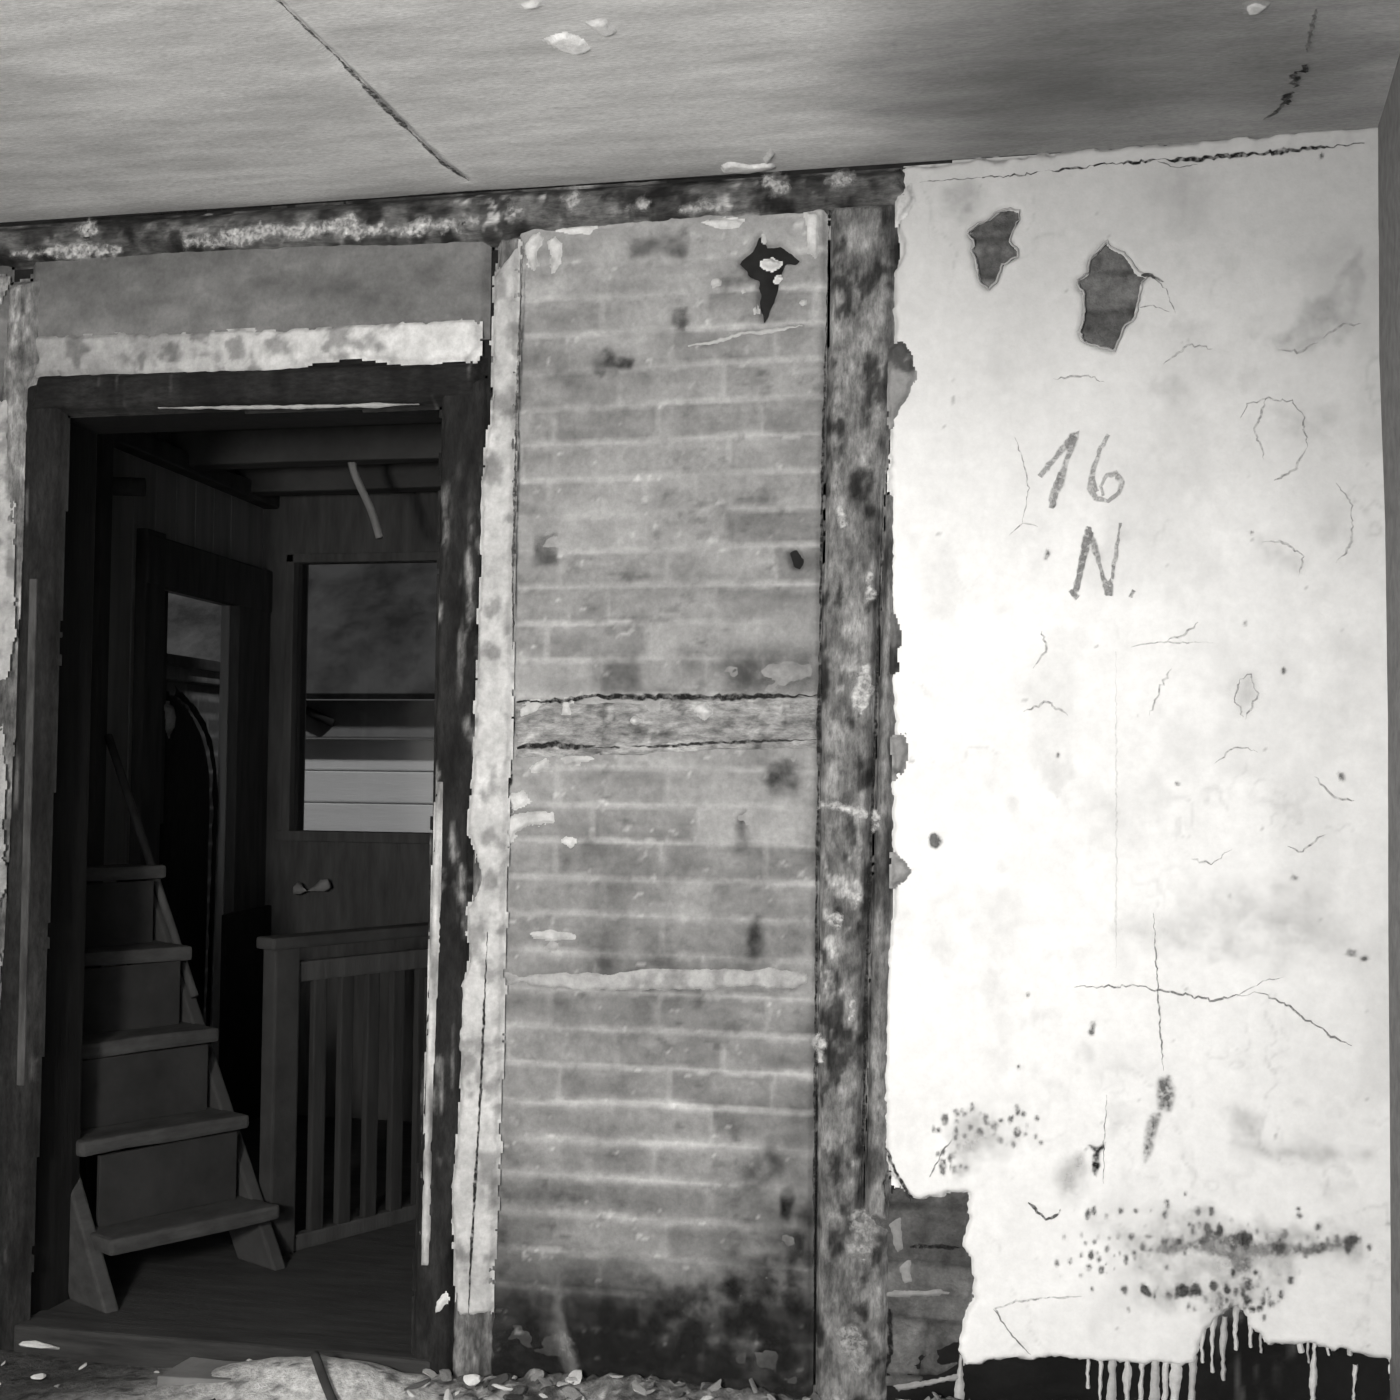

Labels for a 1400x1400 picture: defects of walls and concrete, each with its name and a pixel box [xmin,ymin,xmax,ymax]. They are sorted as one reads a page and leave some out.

peeling [13,222,121,259]
peeling [184,213,479,247]
spalling [760,234,783,284]
flaking render [967,207,1020,290]
flaking render [1077,239,1174,352]
crack [517,693,821,703]
crack [517,739,817,750]
crack [1077,913,1352,1071]
damp [491,1197,815,1400]
flaking render [871,1186,974,1391]
damp [1121,1207,1293,1319]
damp [1268,1224,1371,1257]